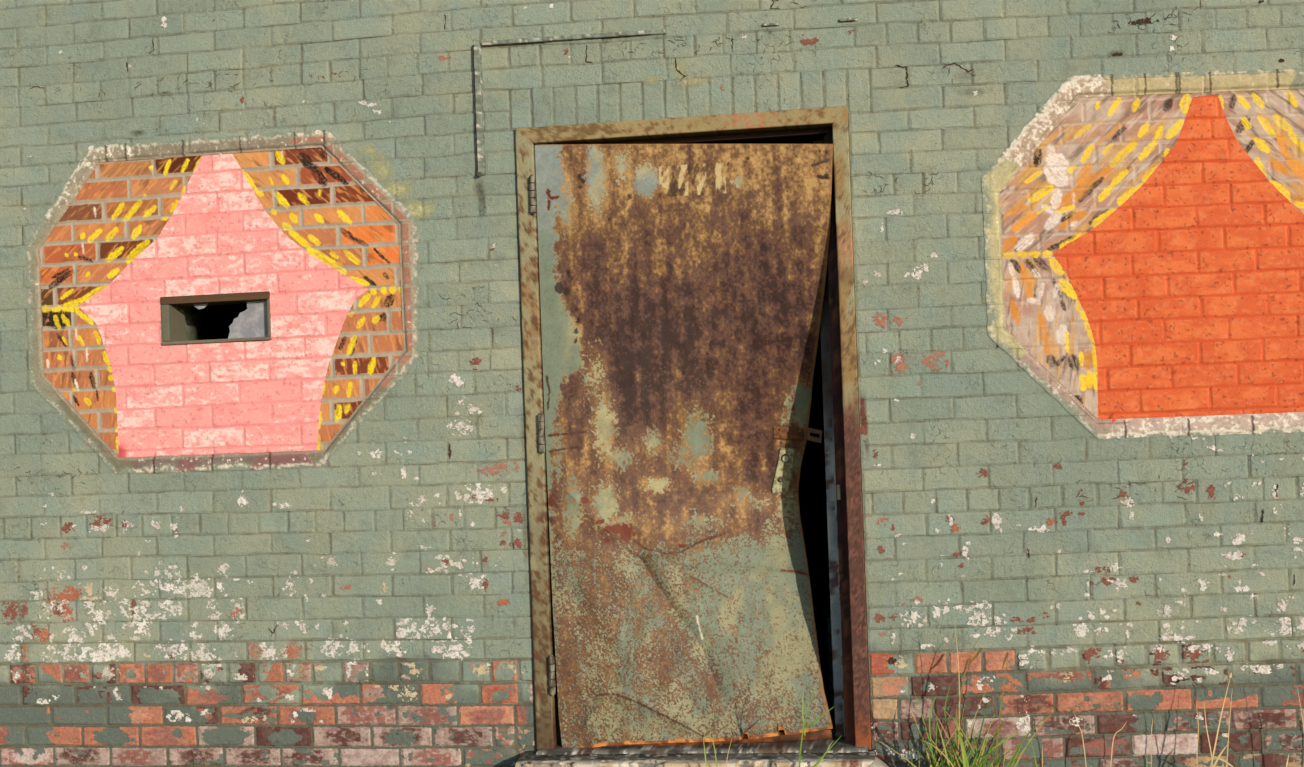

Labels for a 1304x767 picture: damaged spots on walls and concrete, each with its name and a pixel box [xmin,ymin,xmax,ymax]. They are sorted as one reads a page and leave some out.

peeling [904,252,940,283]
peeling [874,348,949,385]
peeling [41,488,134,552]
peeling [137,506,183,556]
peeling [358,437,525,606]
peeling [935,514,971,577]
peeling [980,489,1086,533]
peeling [1118,489,1134,520]
peeling [1178,460,1304,558]
peeling [282,553,351,602]
peeling [0,562,562,767]
peeling [867,530,1304,767]